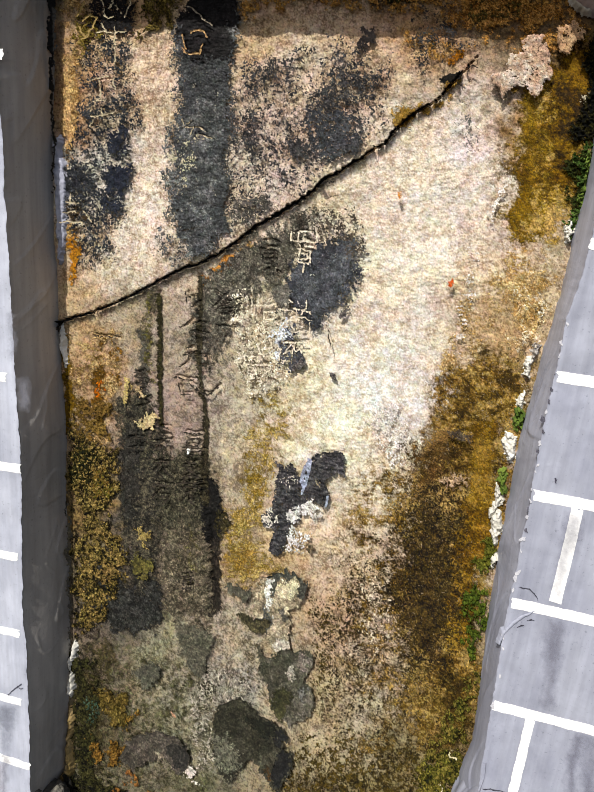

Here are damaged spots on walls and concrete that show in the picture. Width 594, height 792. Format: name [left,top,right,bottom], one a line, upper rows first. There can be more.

damp [49,0,88,193]
crack [54,55,481,337]
damp [61,205,319,669]
damp [272,0,593,792]
damp [183,659,257,785]